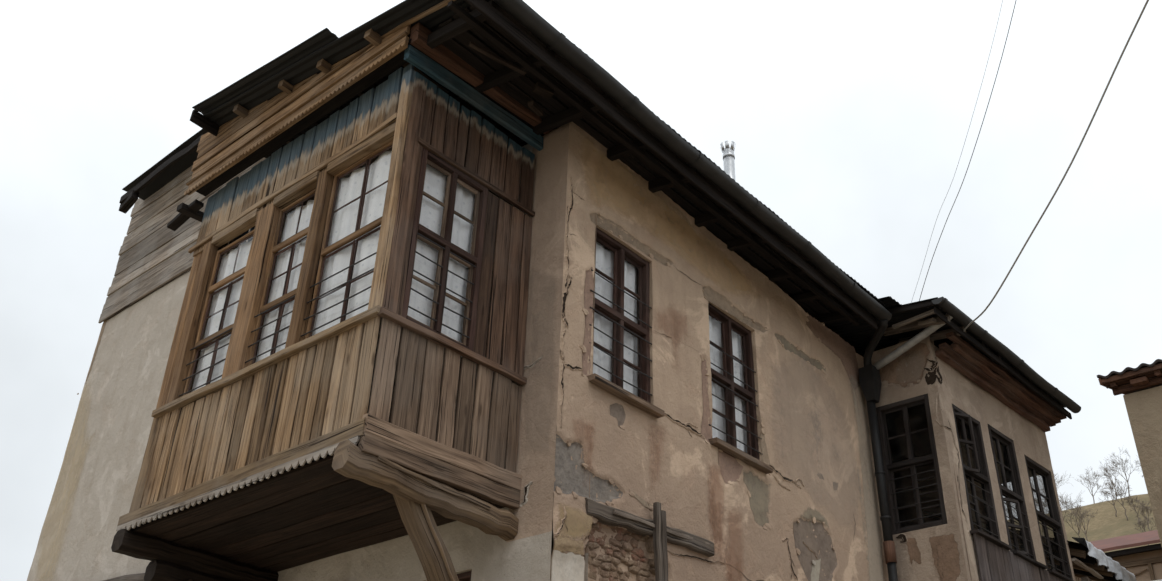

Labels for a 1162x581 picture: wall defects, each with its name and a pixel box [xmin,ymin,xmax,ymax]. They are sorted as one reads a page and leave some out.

crack [559,176,585,427]
spalling [554,434,653,510]
crack [665,412,705,439]
spalling [700,355,772,530]
crack [763,461,805,491]
spalling [581,516,655,581]
spalling [793,517,837,581]